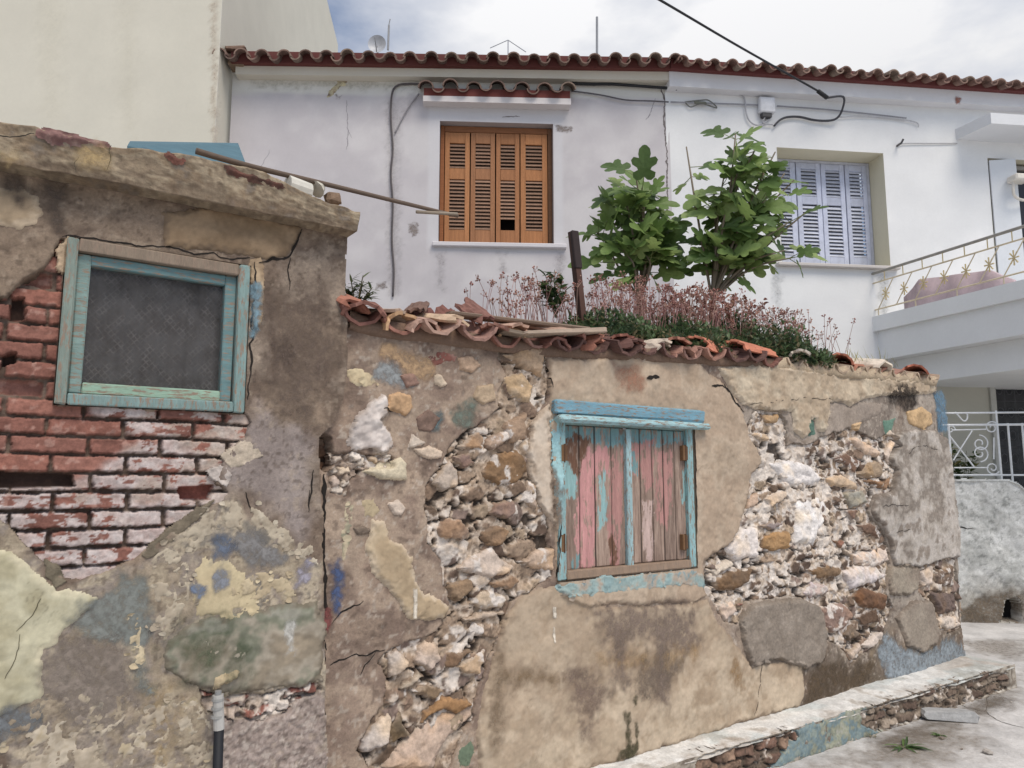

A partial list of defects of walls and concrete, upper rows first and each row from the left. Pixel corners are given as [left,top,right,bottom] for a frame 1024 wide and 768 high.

spalling [35,127,112,149]
spalling [164,151,186,165]
spalling [224,165,285,189]
crack [62,229,302,400]
spalling [0,236,319,768]
crack [308,470,384,674]
damp [594,601,698,705]
spalling [319,344,1009,768]